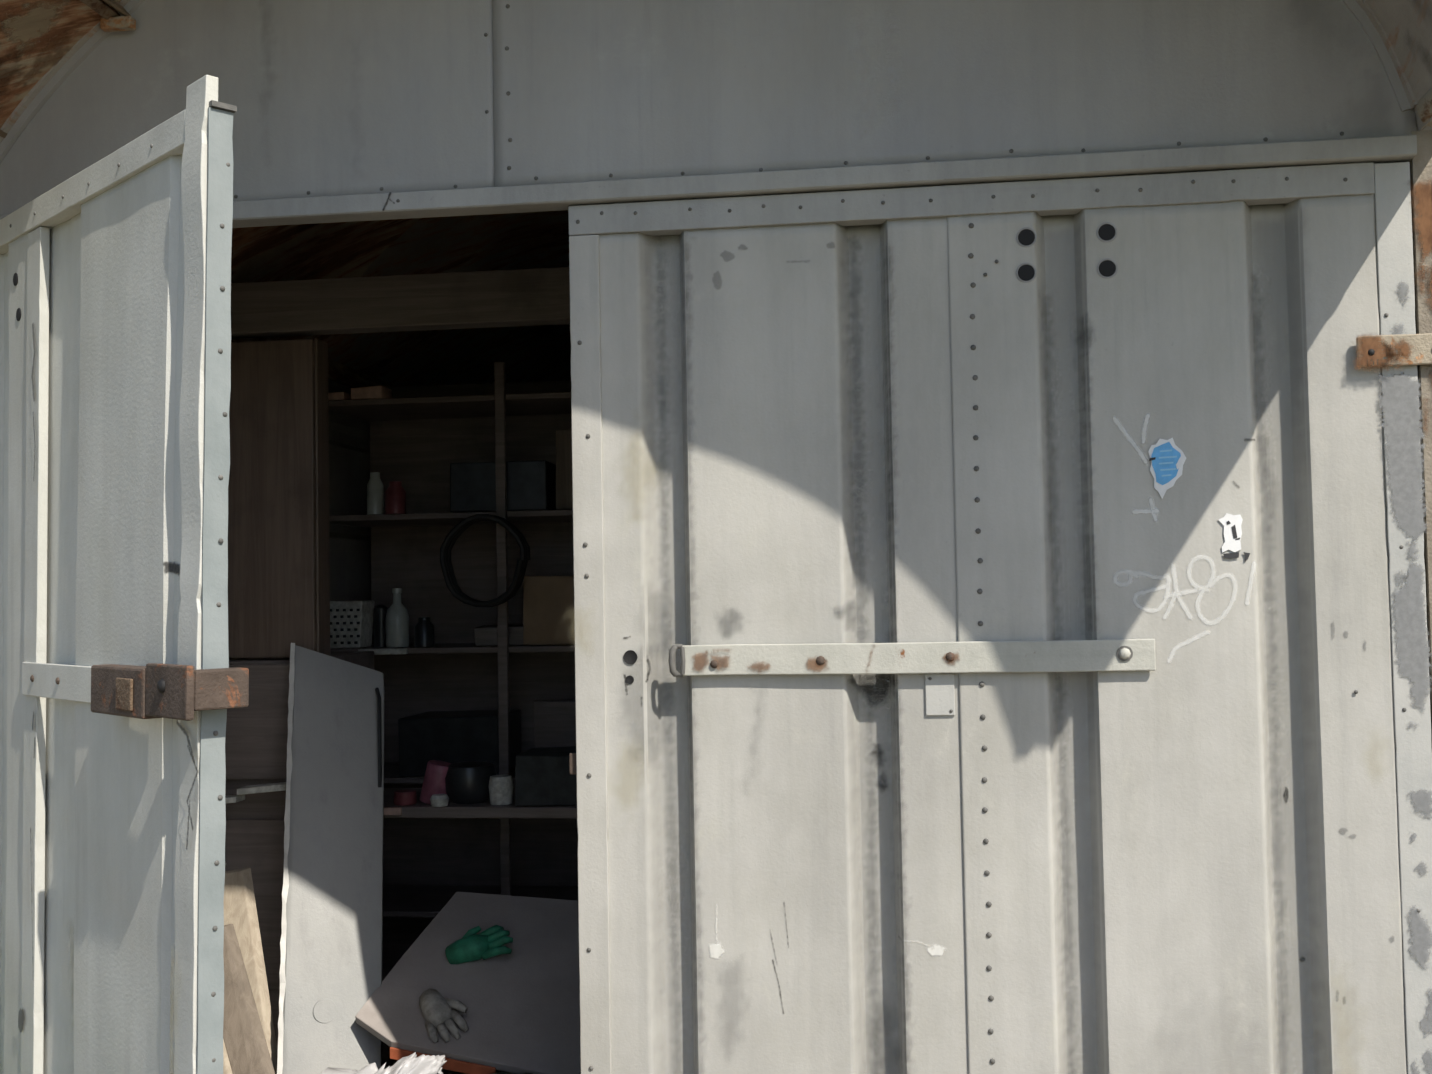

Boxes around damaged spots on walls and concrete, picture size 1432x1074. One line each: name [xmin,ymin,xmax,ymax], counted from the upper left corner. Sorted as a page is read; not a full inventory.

rust [1414,181,1432,304]
peeling [1396,282,1409,304]
rust [1356,336,1411,371]
peeling [1378,373,1431,728]
rust [694,652,729,671]
rust [807,659,827,670]
peeling [1408,790,1432,819]
peeling [1409,907,1432,968]
peeling [1412,989,1432,1074]